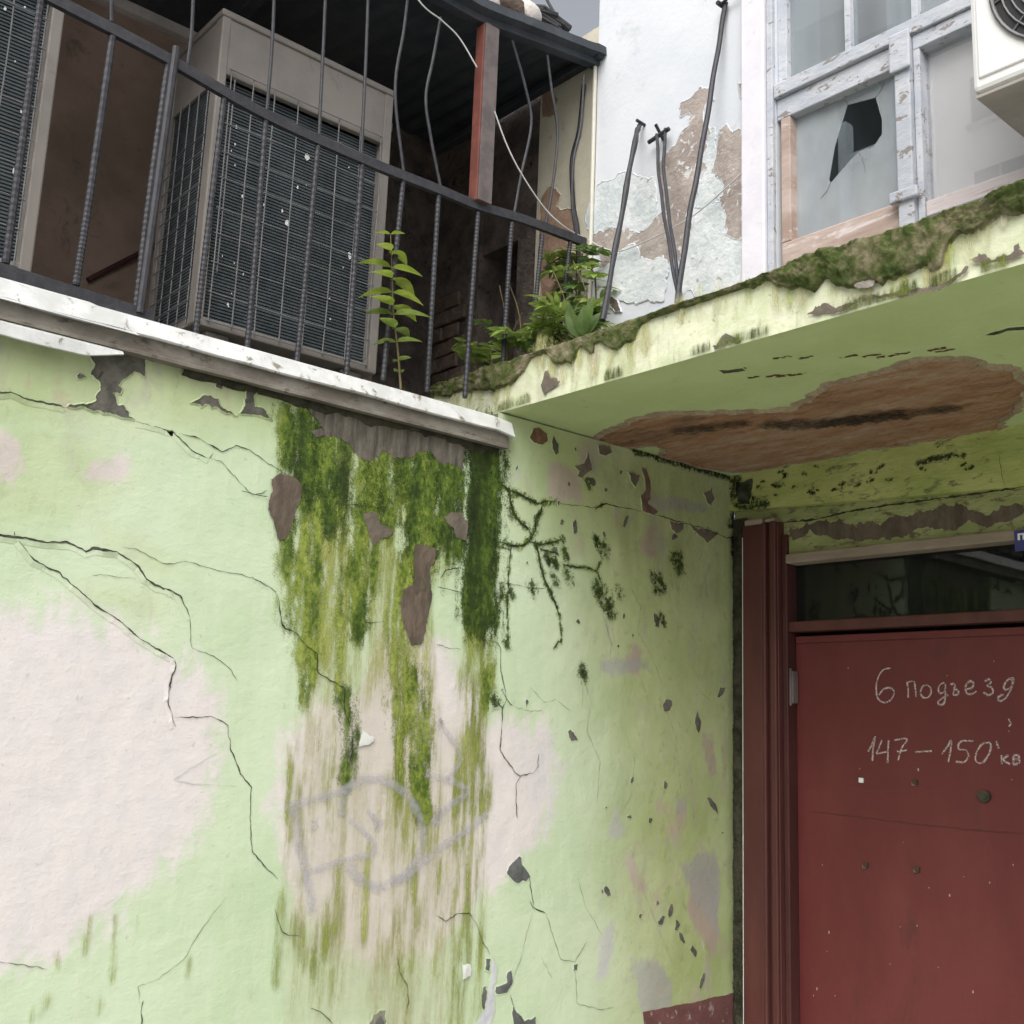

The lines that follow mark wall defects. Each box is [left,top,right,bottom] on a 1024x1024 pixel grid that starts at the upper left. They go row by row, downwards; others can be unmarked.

peeling [537,85,742,313]
crack [0,392,65,413]
spalling [66,354,148,421]
spalling [567,356,1024,493]
crack [135,421,287,497]
spalling [268,474,302,540]
leakage [508,547,574,600]
leakage [590,576,622,620]
leakage [650,551,686,596]
crack [0,531,353,879]
leakage [577,663,588,685]
crack [488,485,731,814]